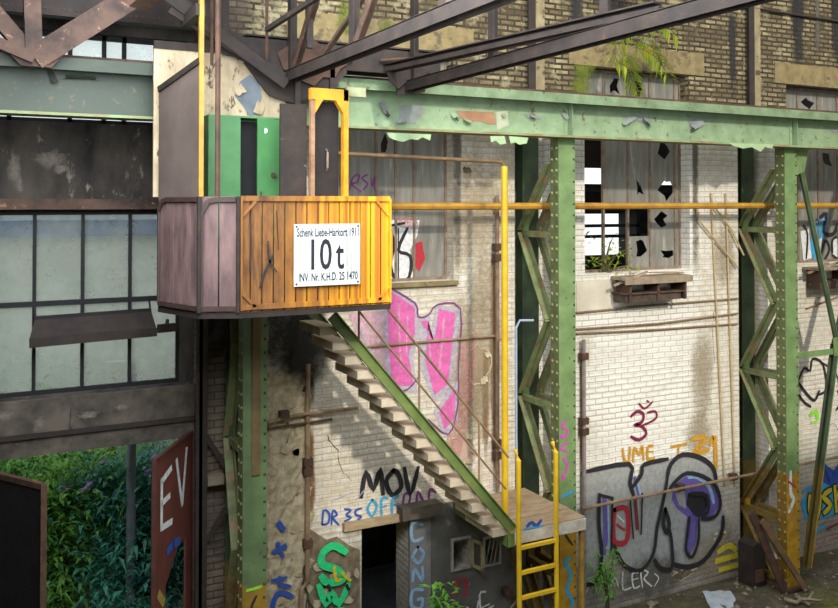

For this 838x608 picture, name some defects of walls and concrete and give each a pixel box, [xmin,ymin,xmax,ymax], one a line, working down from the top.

peeling [233,75,265,116]
peeling [379,100,431,142]
peeling [451,111,528,145]
peeling [622,115,651,127]
peeling [8,155,23,192]
peeling [36,150,68,173]
peeling [729,143,774,152]
water stain [717,231,732,280]
water stain [695,345,710,410]